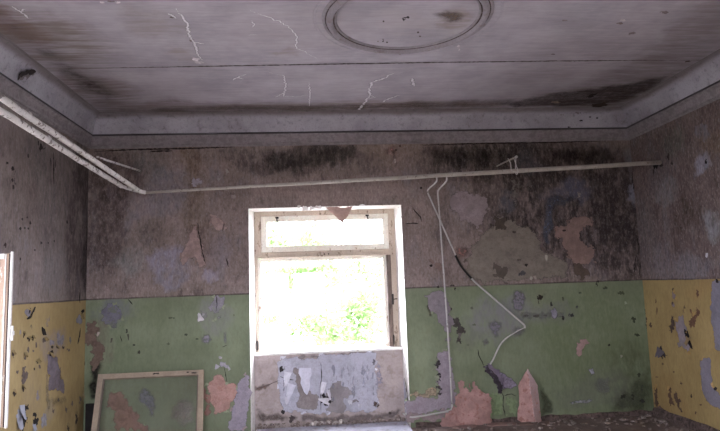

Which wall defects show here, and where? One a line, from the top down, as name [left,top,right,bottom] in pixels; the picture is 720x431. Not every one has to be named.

crack [121,8,692,110]
leakage [515,79,660,107]
peeling [448,190,607,290]
flaking render [12,302,140,431]
flaking render [204,356,252,431]
peeling [277,351,383,423]
flaking render [403,285,476,423]
flaking render [695,279,720,414]